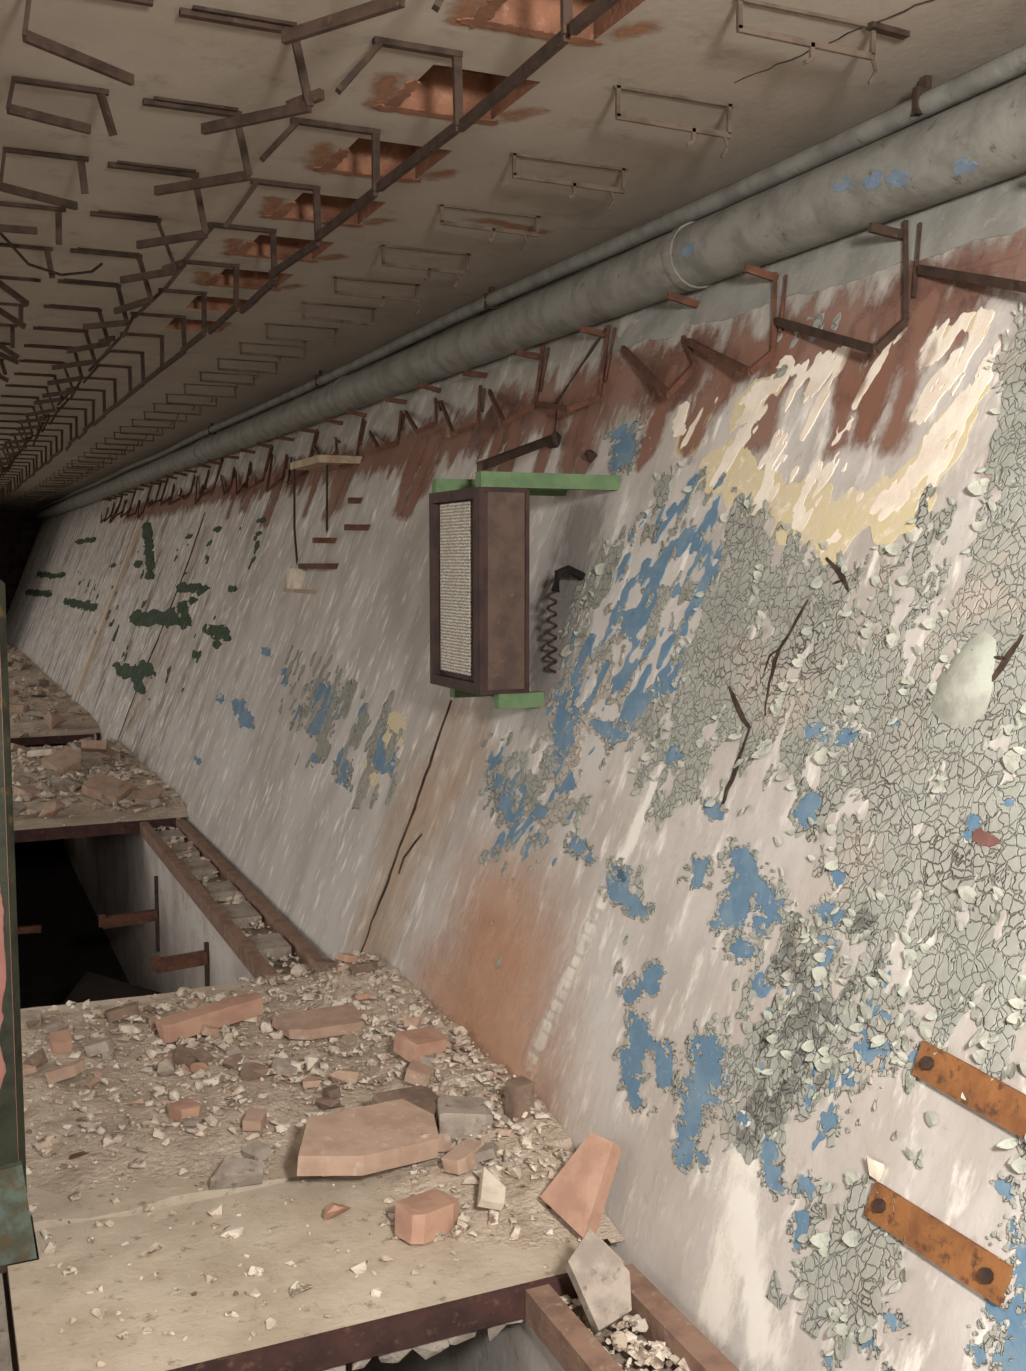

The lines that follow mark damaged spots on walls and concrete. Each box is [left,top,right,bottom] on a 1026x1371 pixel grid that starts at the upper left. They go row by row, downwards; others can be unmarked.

rust [123,229,1026,533]
peeling [25,522,231,701]
peeling [239,517,266,569]
peeling [478,300,1026,1371]